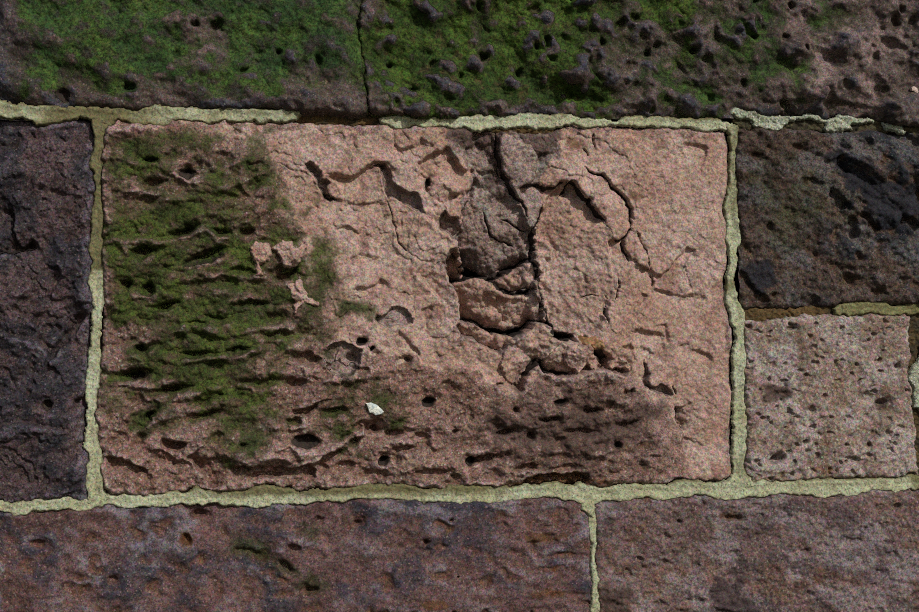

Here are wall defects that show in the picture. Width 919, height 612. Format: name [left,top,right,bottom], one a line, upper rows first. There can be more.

spalling [178,114,732,483]
crack [483,134,651,327]